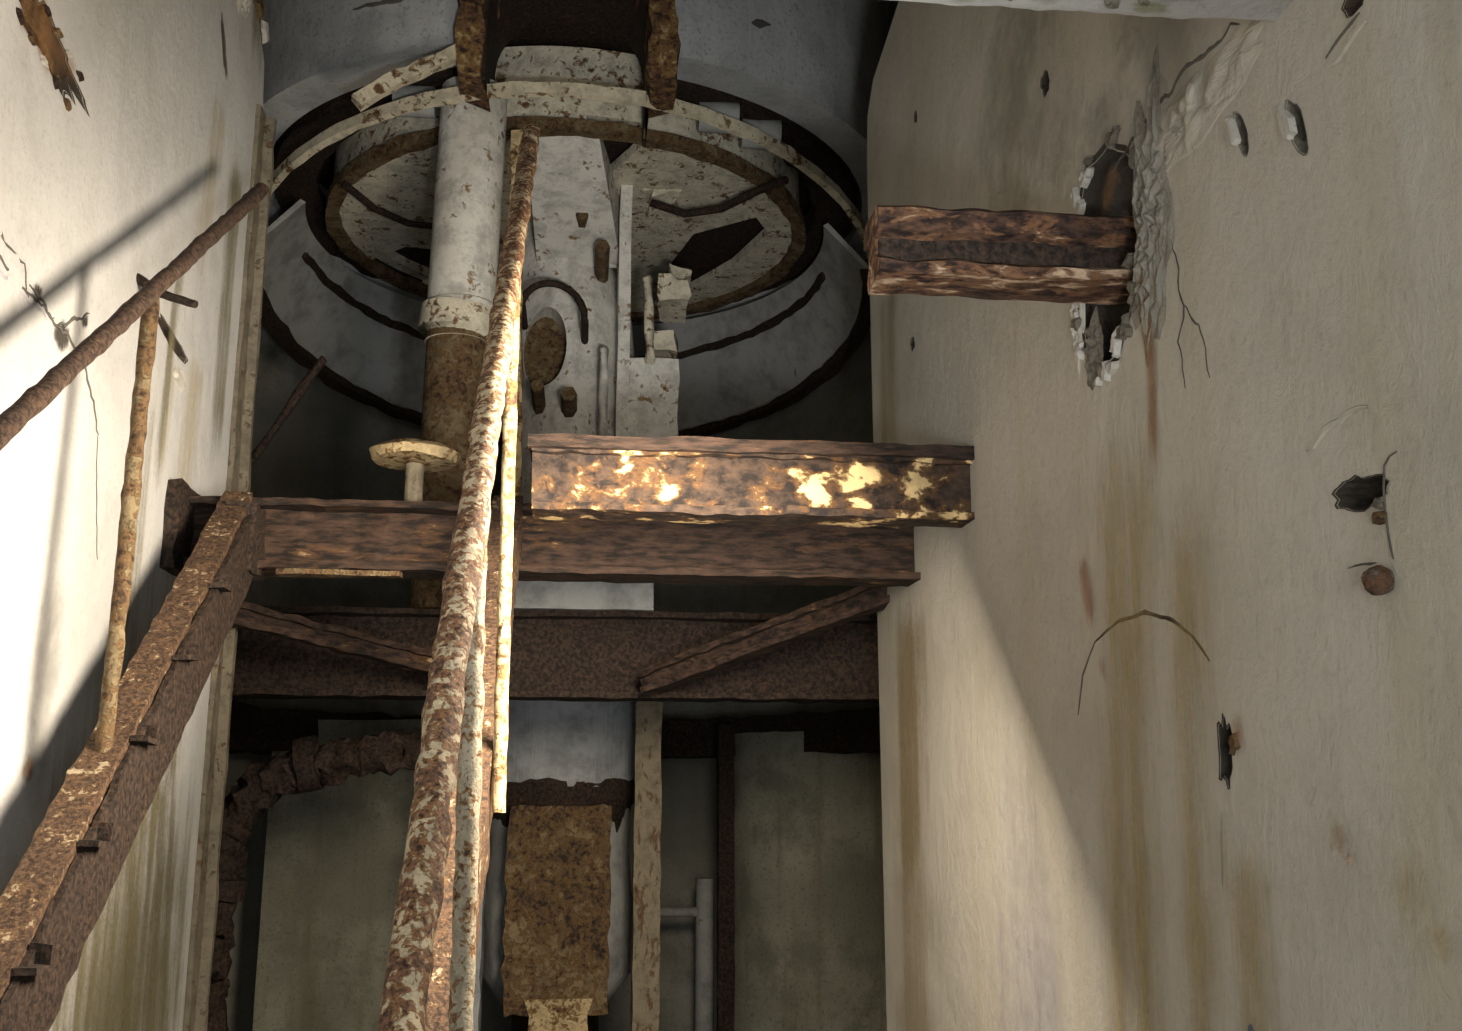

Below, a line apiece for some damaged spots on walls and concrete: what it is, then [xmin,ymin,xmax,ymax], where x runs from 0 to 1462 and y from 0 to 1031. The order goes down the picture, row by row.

spalling [16,0,90,117]
spalling [1224,111,1249,157]
spalling [1276,99,1308,156]
spalling [1069,44,1176,442]
crack [0,238,99,560]
peeling [1228,732,1241,756]